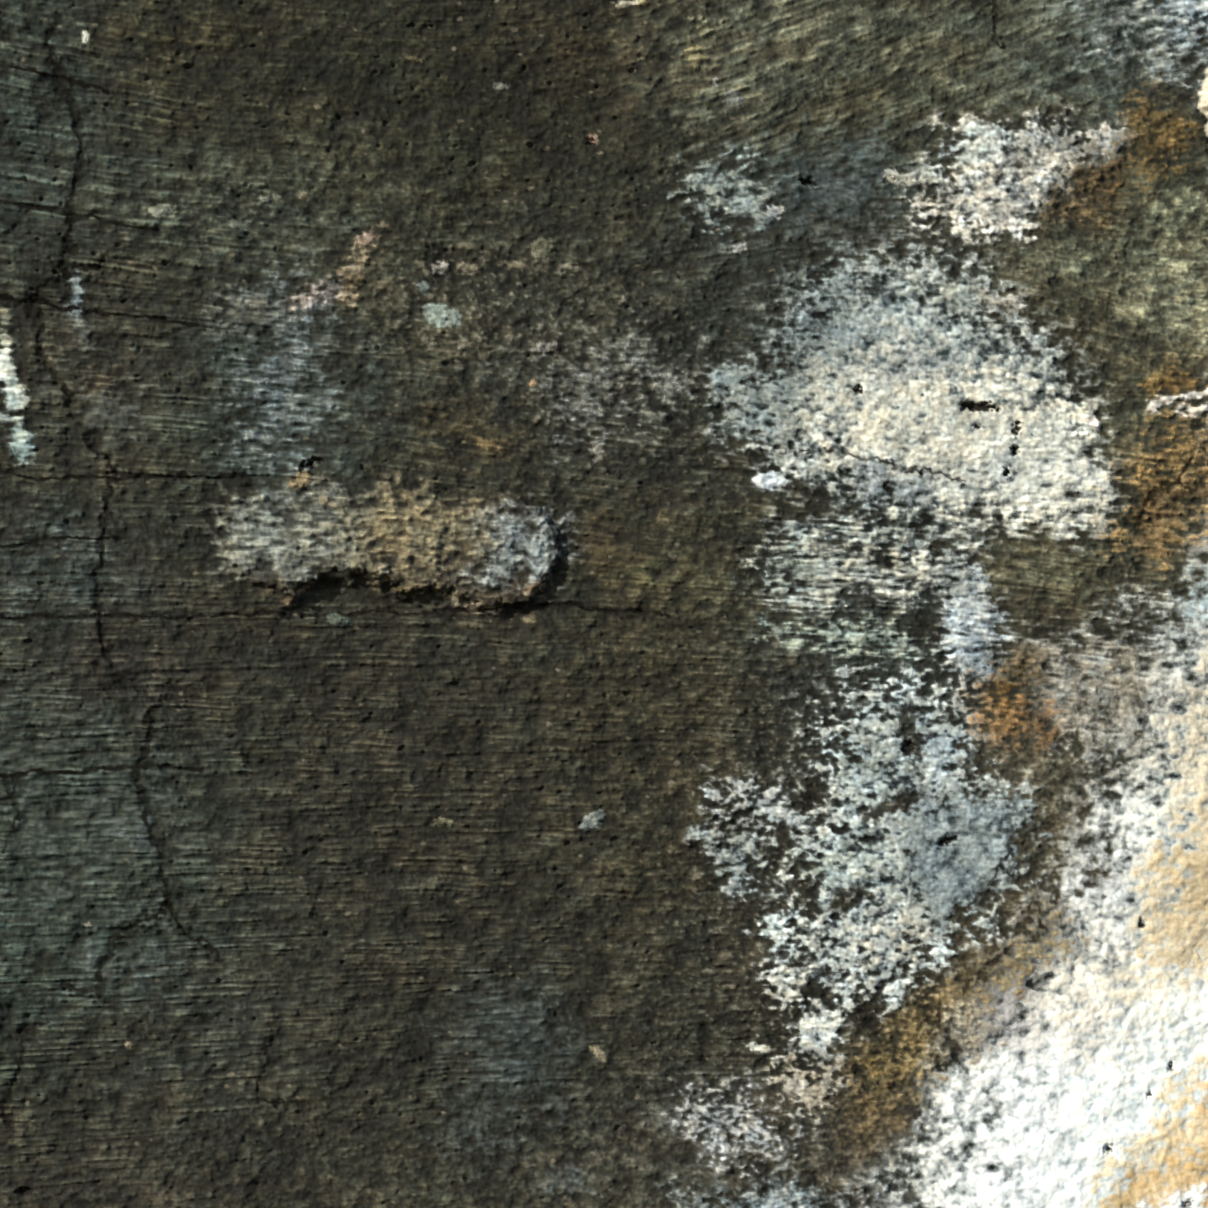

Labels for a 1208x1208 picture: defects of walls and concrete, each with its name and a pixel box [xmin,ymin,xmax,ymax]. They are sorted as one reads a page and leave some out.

flaking render [1197,68,1208,137]
crack [3,14,118,664]
damp [557,112,1134,1129]
crack [63,695,222,998]
damp [1024,626,1208,968]
damp [1091,1080,1208,1208]